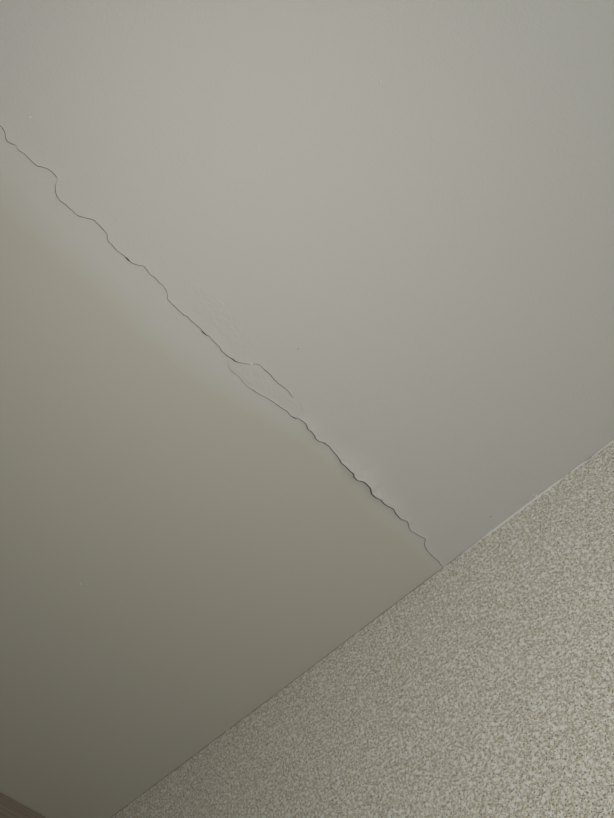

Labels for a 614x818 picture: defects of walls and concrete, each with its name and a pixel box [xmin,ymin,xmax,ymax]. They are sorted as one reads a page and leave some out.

flaking render [297,410,447,566]